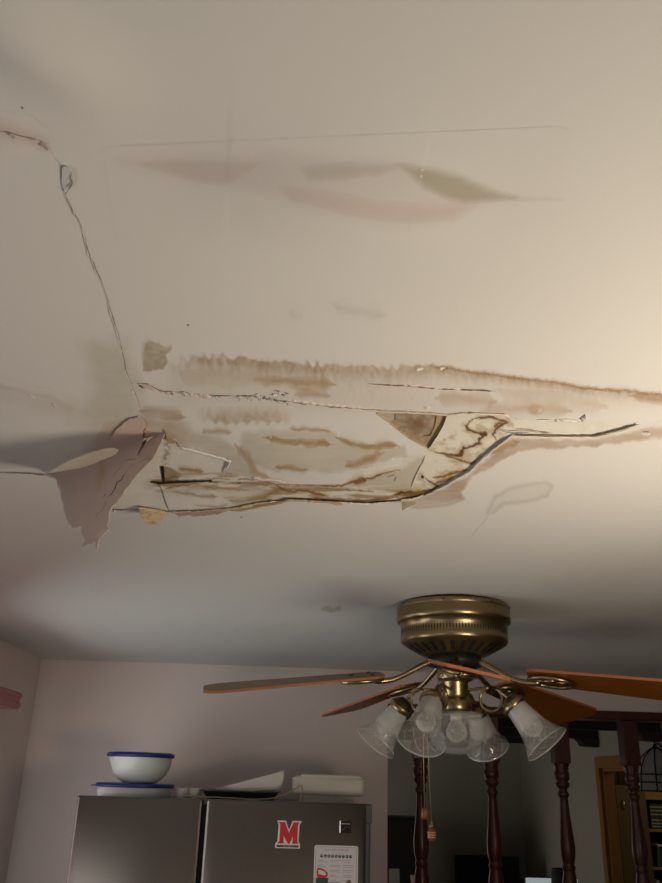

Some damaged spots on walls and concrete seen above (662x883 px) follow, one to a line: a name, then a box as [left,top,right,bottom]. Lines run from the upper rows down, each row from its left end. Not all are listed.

crack [0,130,366,418]
crack [0,471,55,479]
peeling [47,417,176,551]
damp [0,327,662,511]
crack [386,415,447,488]
crack [369,382,493,392]
damp [484,477,557,518]